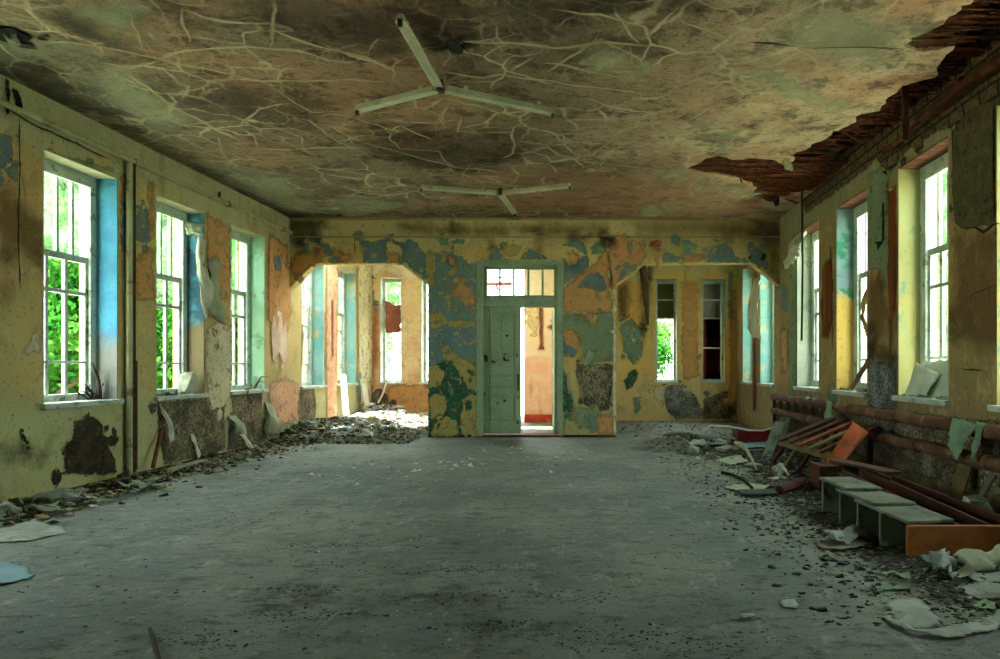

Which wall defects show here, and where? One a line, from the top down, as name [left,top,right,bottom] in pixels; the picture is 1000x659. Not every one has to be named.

peeling [0,133,19,186]
crack [4,107,109,292]
peeling [206,214,232,302]
crack [0,0,534,188]
peeling [0,231,547,530]
peeling [523,233,769,436]
crack [443,8,904,171]
spalling [776,260,1000,497]
spalling [803,24,1000,341]
crack [957,223,999,233]